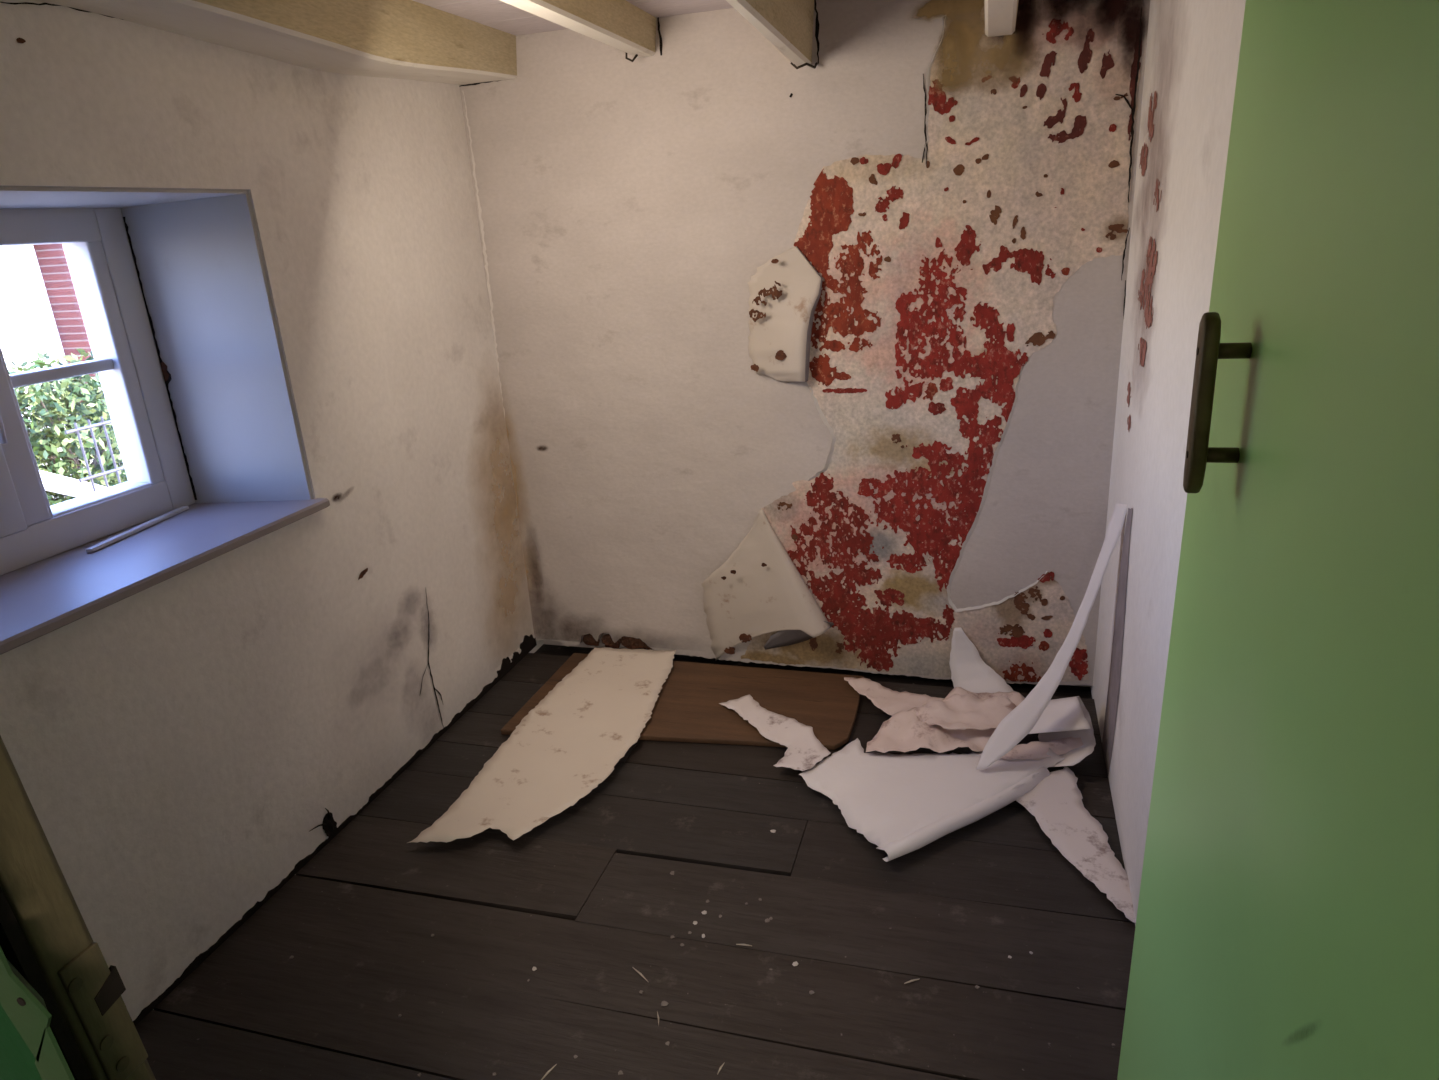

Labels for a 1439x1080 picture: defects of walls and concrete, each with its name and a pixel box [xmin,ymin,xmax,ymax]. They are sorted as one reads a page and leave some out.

damp [916,0,1145,88]
peeling [741,0,1144,682]
peeling [1102,508,1133,775]